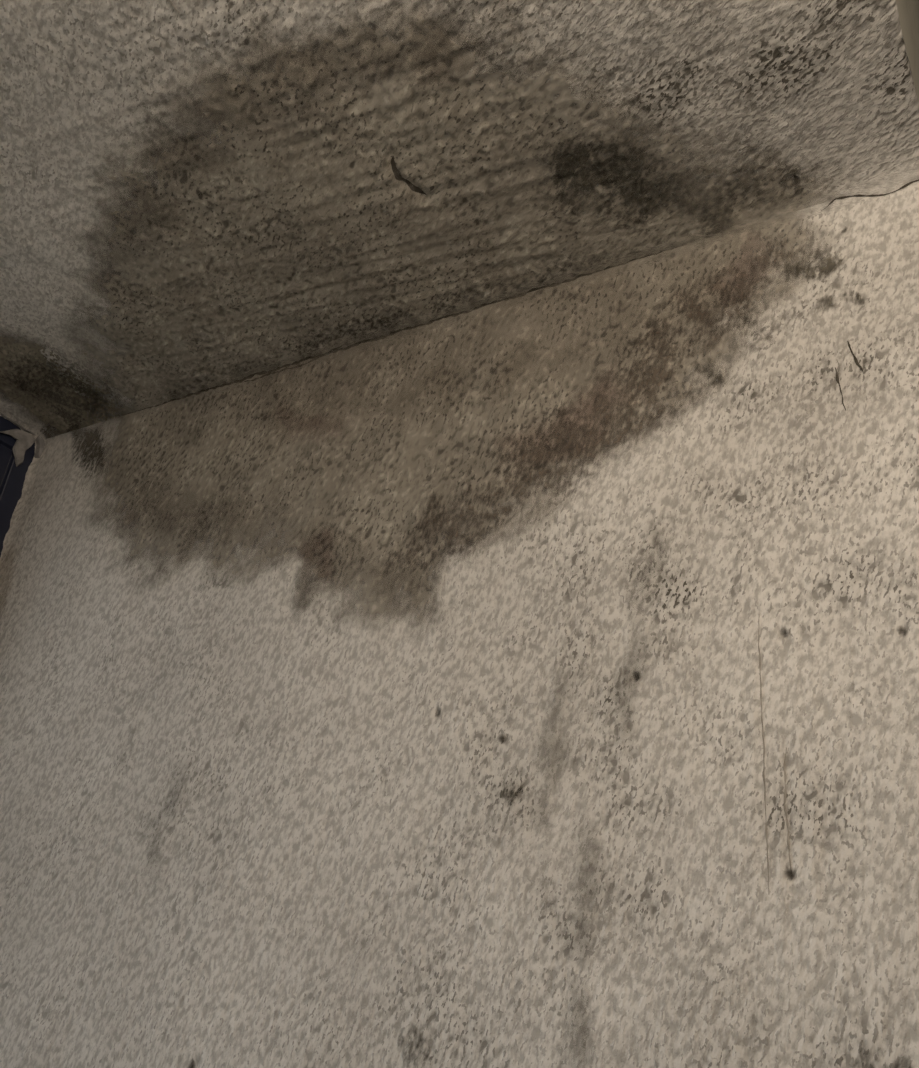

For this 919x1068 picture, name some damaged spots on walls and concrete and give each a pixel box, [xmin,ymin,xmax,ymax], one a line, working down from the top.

leakage [0,21,842,618]
crack [821,180,919,211]